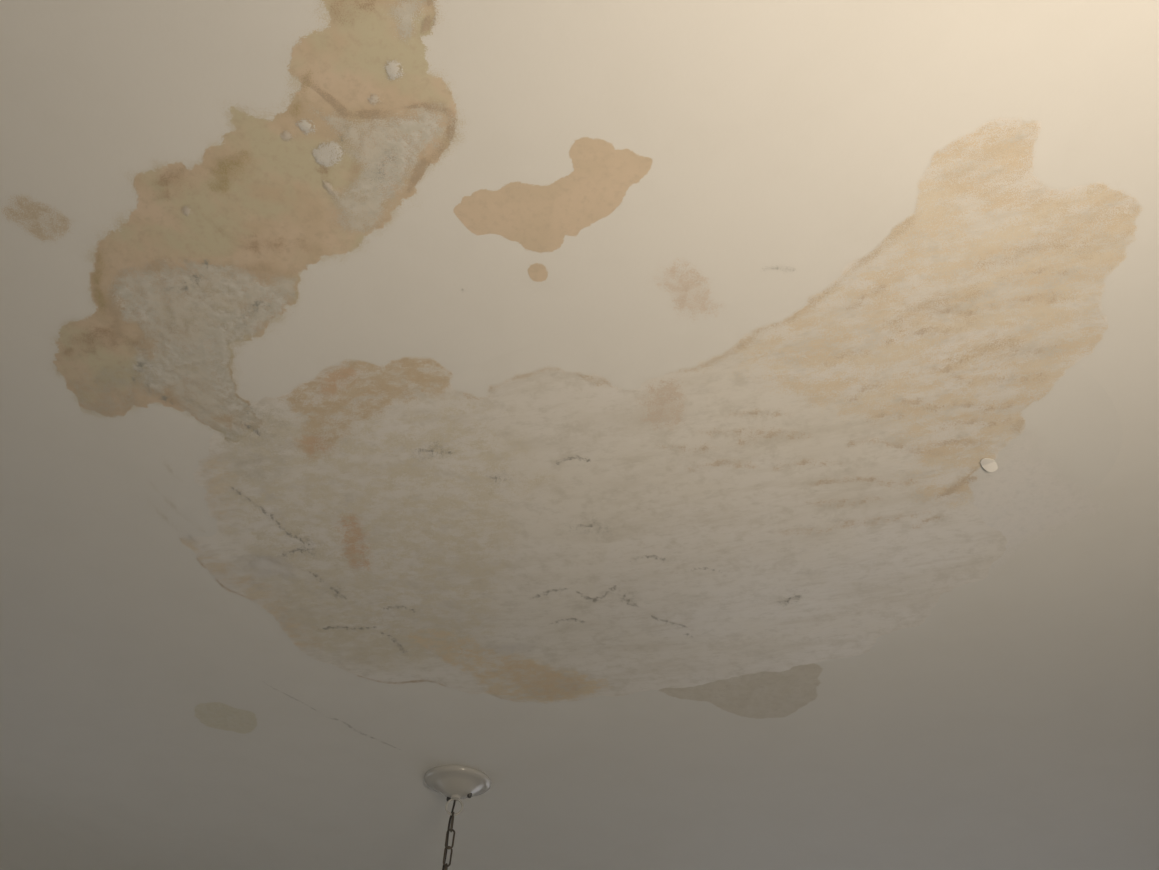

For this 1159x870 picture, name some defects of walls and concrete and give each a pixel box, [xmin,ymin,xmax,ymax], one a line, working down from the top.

peeling [46,0,1144,704]